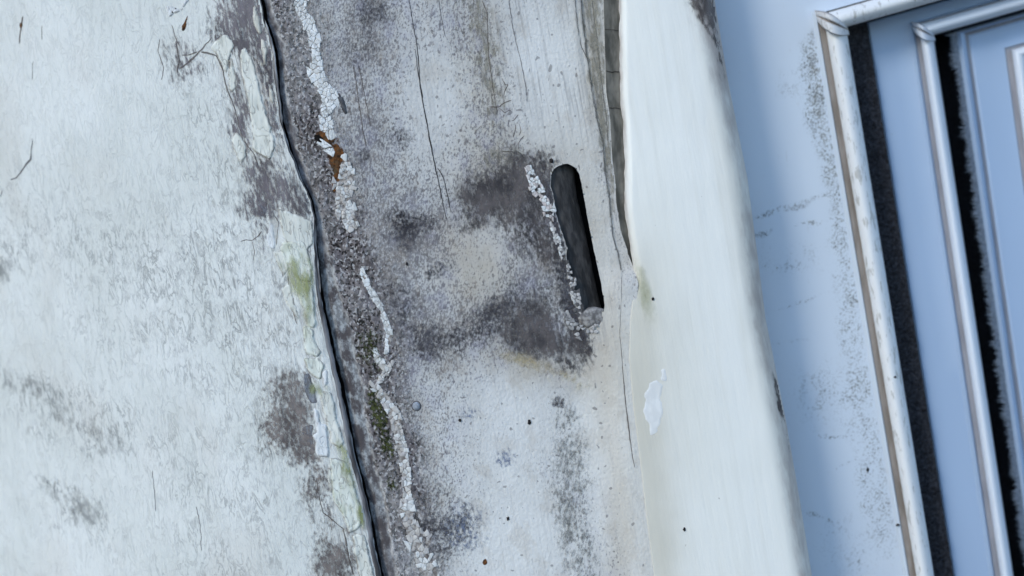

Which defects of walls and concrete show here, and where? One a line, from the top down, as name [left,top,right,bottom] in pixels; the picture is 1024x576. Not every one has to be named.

water stain [208,0,283,141]
water stain [227,73,313,225]
corrosion [314,131,344,192]
crack [409,1,451,219]
water stain [804,48,840,208]
crack [243,216,289,285]
peeling [211,0,380,576]
crack [261,0,384,576]
water stain [386,151,592,369]
water stain [263,371,331,516]
peeling [643,369,667,435]